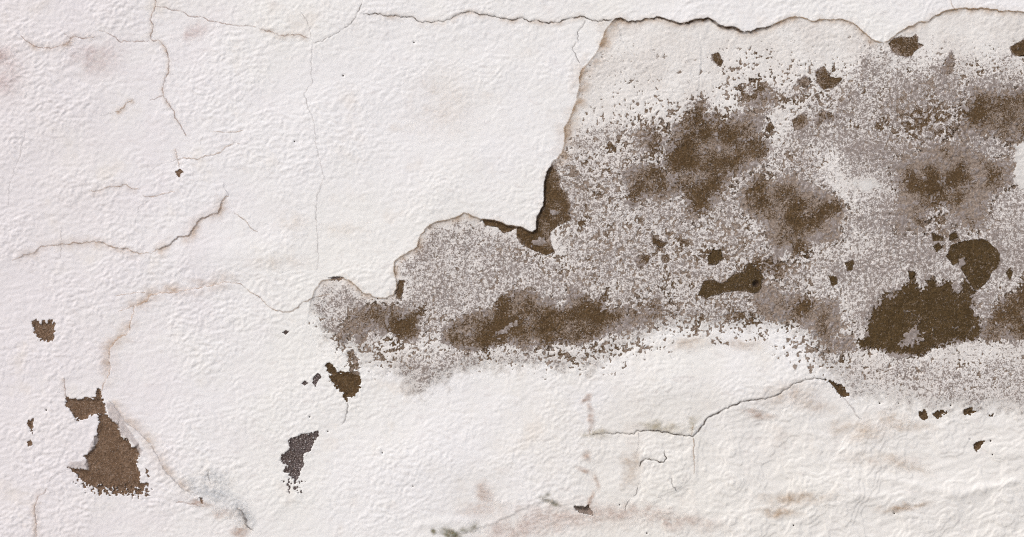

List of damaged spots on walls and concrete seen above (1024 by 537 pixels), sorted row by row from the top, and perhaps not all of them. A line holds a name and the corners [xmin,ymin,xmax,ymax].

spalling [302,7,1024,420]
peeling [32,318,55,342]
peeling [65,388,153,499]
peeling [281,430,328,494]
crack [597,378,827,507]